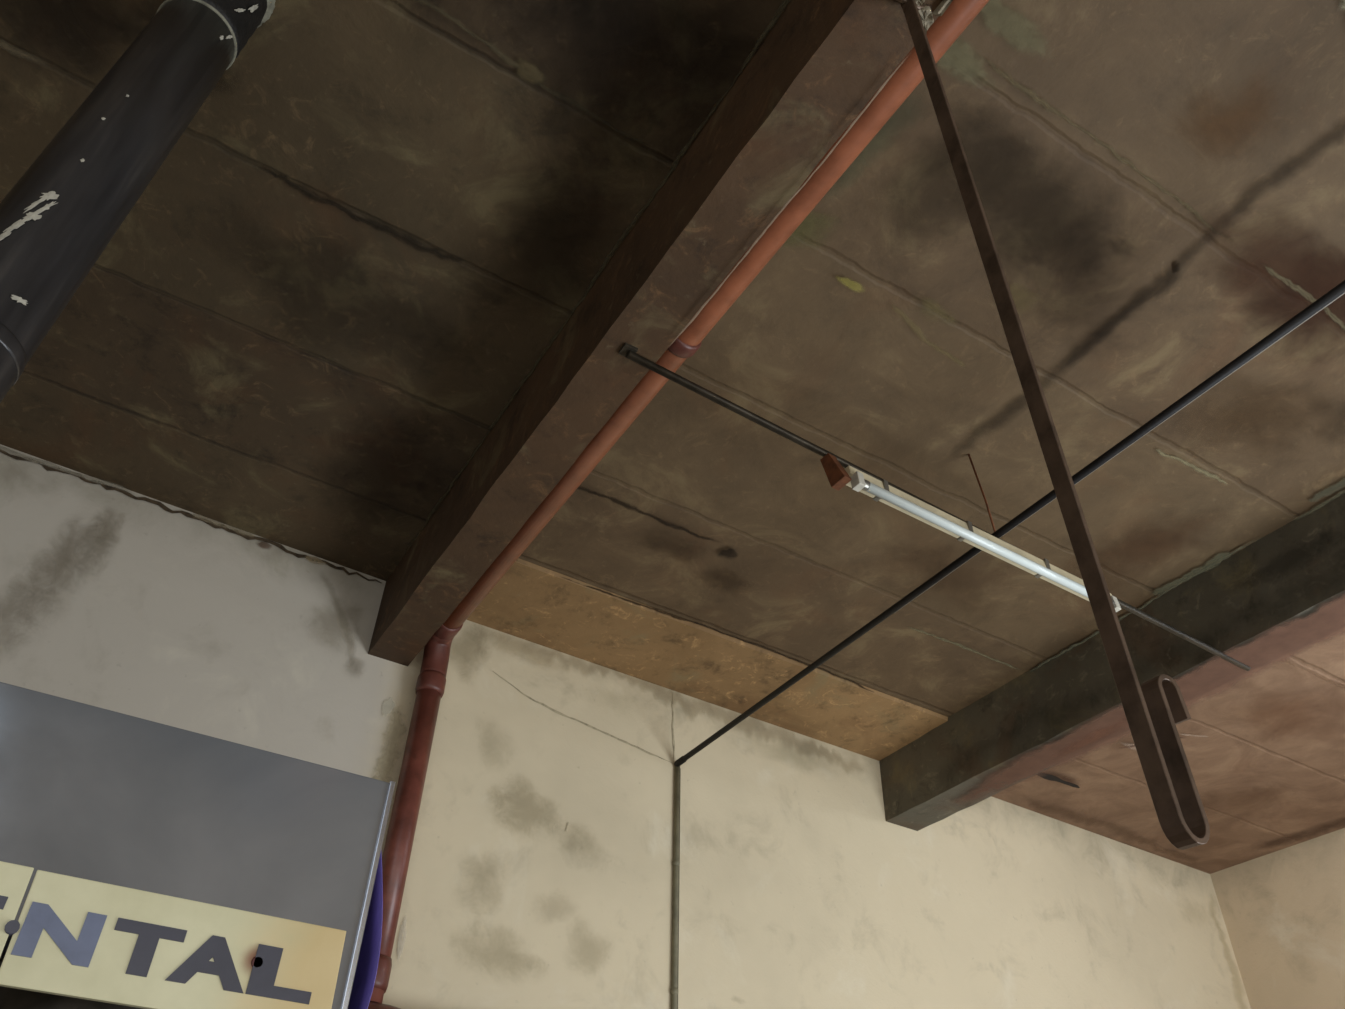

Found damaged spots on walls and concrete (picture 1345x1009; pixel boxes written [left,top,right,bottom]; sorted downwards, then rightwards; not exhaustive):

water stain [1264,265,1345,331]